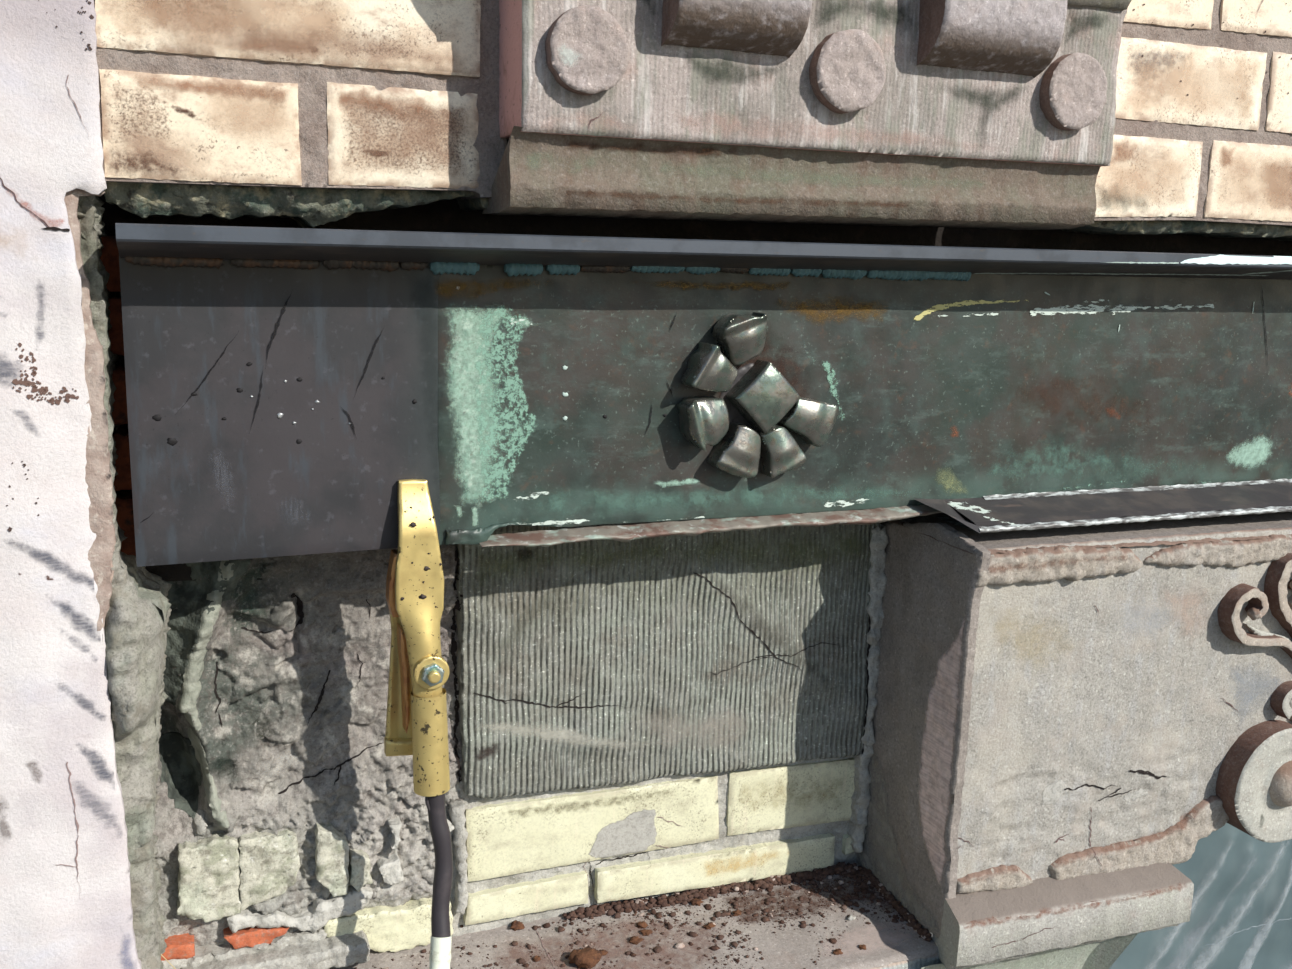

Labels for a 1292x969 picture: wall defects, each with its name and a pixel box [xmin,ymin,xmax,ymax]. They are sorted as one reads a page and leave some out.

crack [0,178,70,231]
leakage [439,282,532,526]
peeling [268,599,297,632]
crack [693,572,855,686]
crack [473,693,635,709]
crack [278,743,382,794]
spalling [589,809,657,859]
crack [1055,770,1167,868]
spalling [161,810,404,961]
spalling [324,898,432,952]